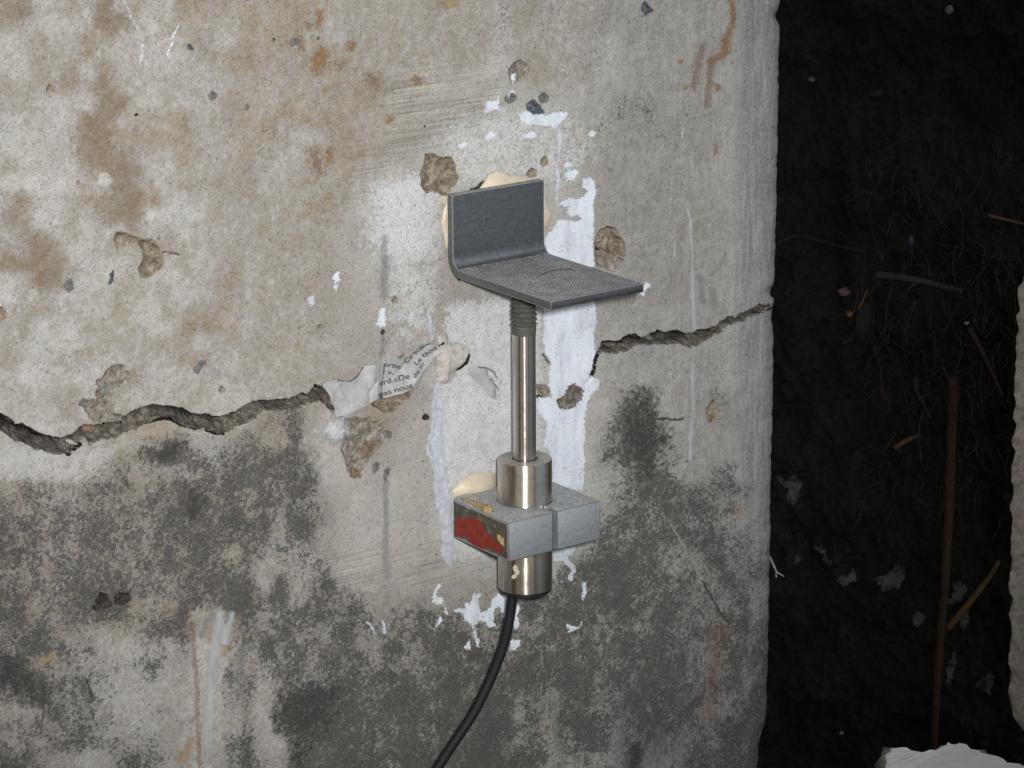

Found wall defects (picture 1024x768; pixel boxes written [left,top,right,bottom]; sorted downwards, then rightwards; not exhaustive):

corrosion [706,0,736,66]
spalling [420,142,467,196]
peeling [482,60,626,271]
spalling [114,231,164,278]
efflorescence [686,207,696,331]
crack [569,293,773,386]
crack [0,384,335,456]
peeling [536,302,600,491]
peeling [422,369,454,568]
peeling [431,584,521,651]
peeling [553,547,588,602]
efflorescence [204,612,234,760]